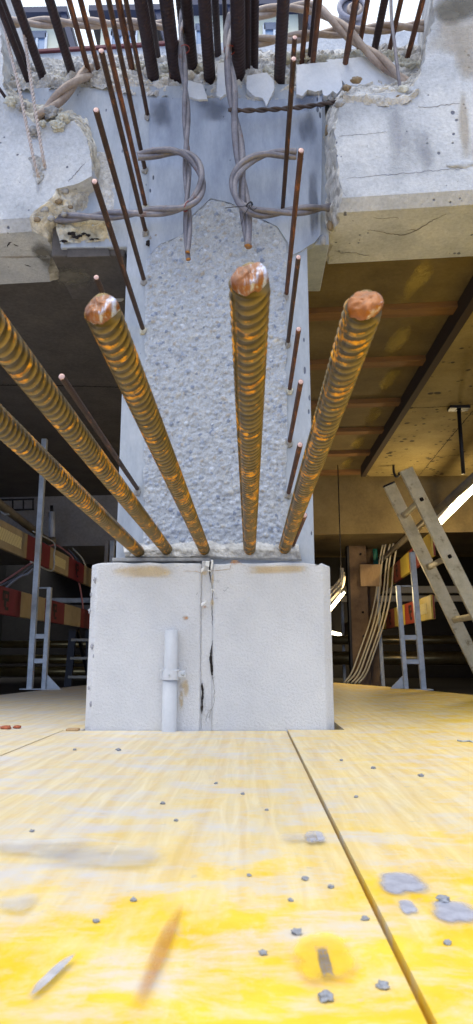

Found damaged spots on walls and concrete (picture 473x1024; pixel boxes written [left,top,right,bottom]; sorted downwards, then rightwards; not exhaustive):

spalling [0,0,435,572]
crack [337,214,446,256]
crack [196,559,245,727]